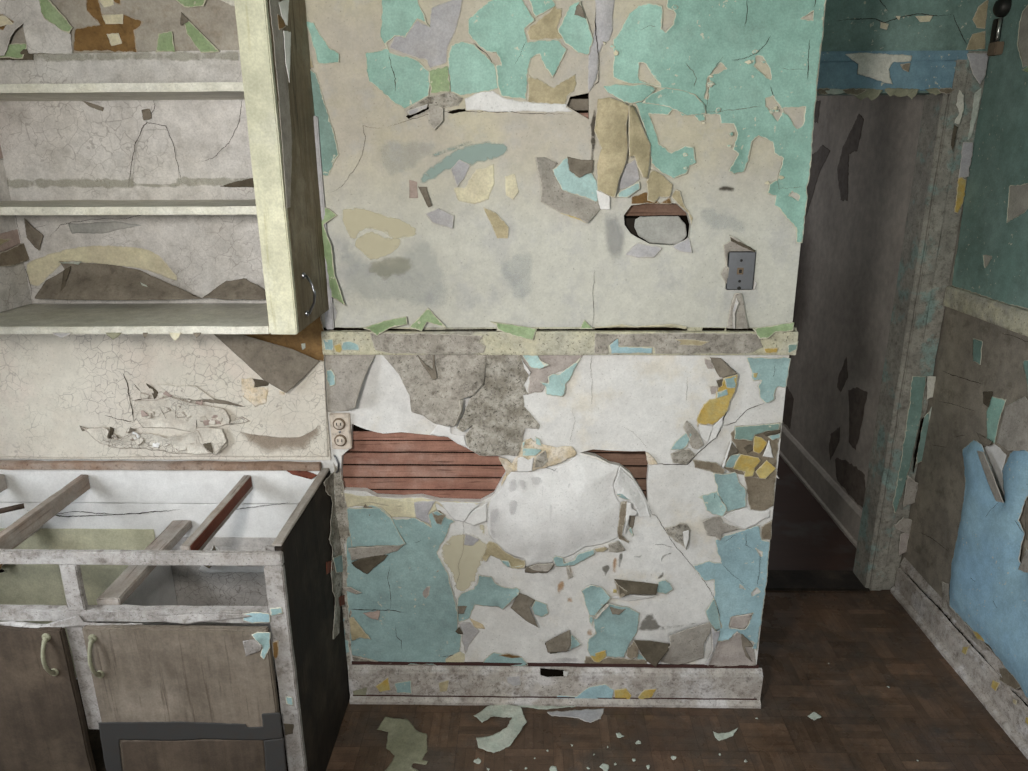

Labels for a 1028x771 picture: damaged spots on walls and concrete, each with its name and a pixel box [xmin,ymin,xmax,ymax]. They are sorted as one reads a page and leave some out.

peeling [277,0,291,83]
peeling [306,21,340,176]
peeling [365,0,1028,309]
peeling [322,207,345,305]
crack [105,374,151,422]
peeling [80,378,285,455]
flaking render [521,355,583,397]
peeling [580,280,799,651]
peeling [829,356,868,508]
peeling [893,376,936,555]
peeling [286,424,657,665]
peeling [942,391,1028,705]